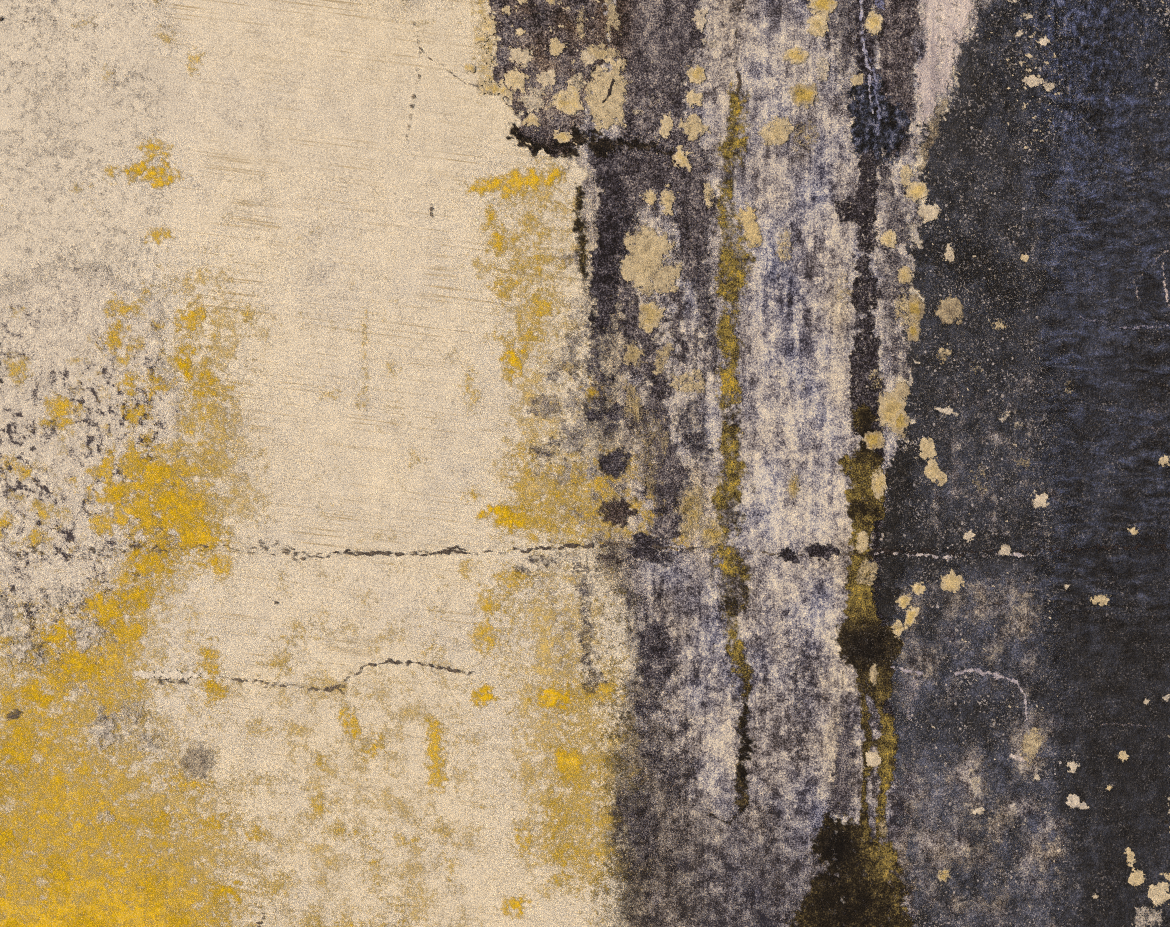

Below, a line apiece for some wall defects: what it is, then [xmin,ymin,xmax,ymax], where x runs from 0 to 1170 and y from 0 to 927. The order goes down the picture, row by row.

damp [459,0,1170,927]
crack [6,542,166,560]
crack [198,540,1168,563]
crack [230,658,474,694]